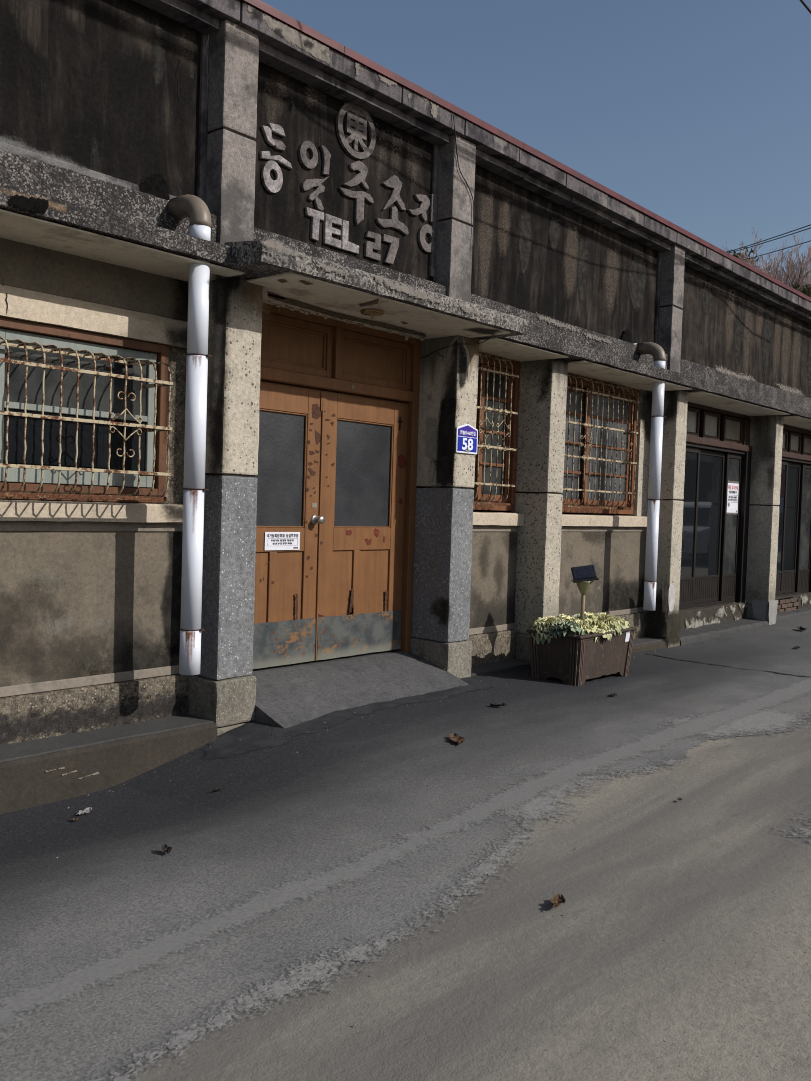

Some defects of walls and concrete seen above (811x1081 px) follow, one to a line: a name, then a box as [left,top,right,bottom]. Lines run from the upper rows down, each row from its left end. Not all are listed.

leakage [426,336,470,487]
leakage [90,531,183,676]
peeling [685,601,747,629]